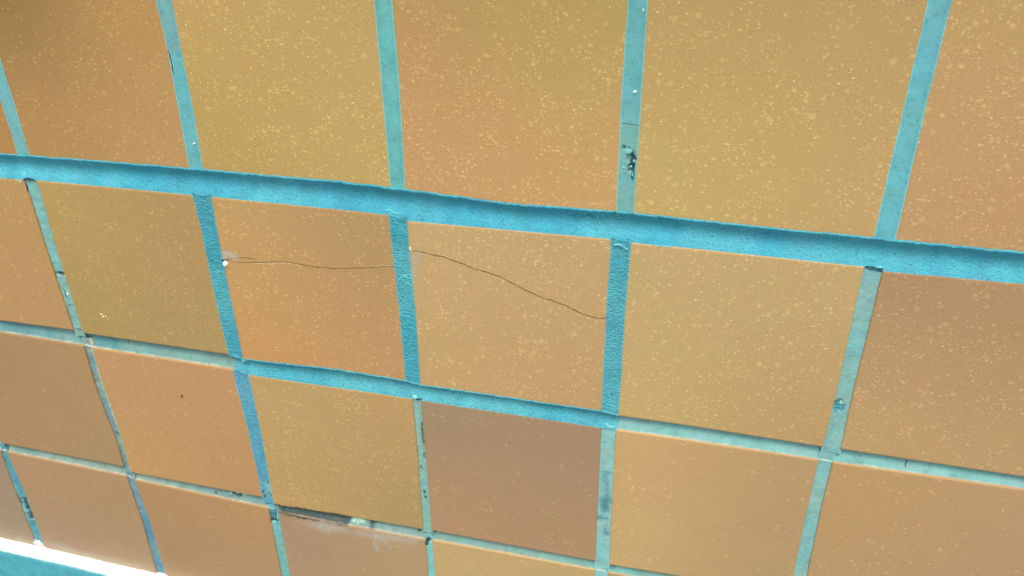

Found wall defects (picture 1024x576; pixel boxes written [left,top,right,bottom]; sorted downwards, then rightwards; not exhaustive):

crack [225,250,605,319]